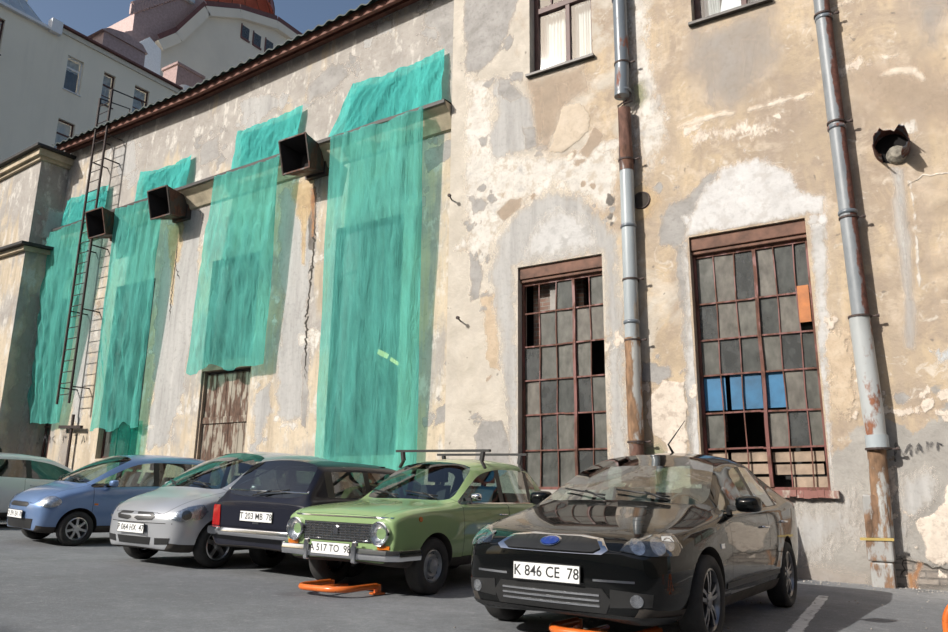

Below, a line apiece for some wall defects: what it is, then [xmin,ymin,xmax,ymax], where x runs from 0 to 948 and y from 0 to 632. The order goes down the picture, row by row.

flaking render [416,0,619,381]
crack [304,208,316,376]
flaking render [642,354,697,453]
flaking render [882,385,948,422]
flaking render [668,466,691,490]
spalling [888,466,948,588]
crack [896,558,948,579]